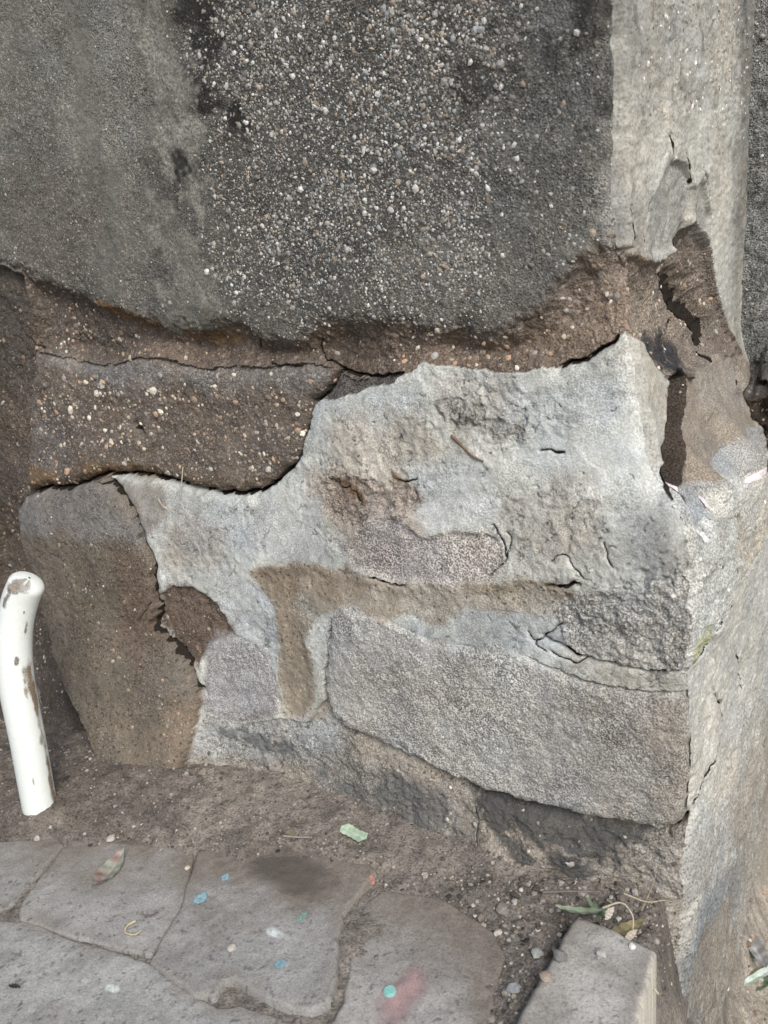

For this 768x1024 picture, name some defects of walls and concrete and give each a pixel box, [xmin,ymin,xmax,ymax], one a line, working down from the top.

spalling [0,154,743,571]
spalling [50,518,194,762]
crack [530,622,613,664]